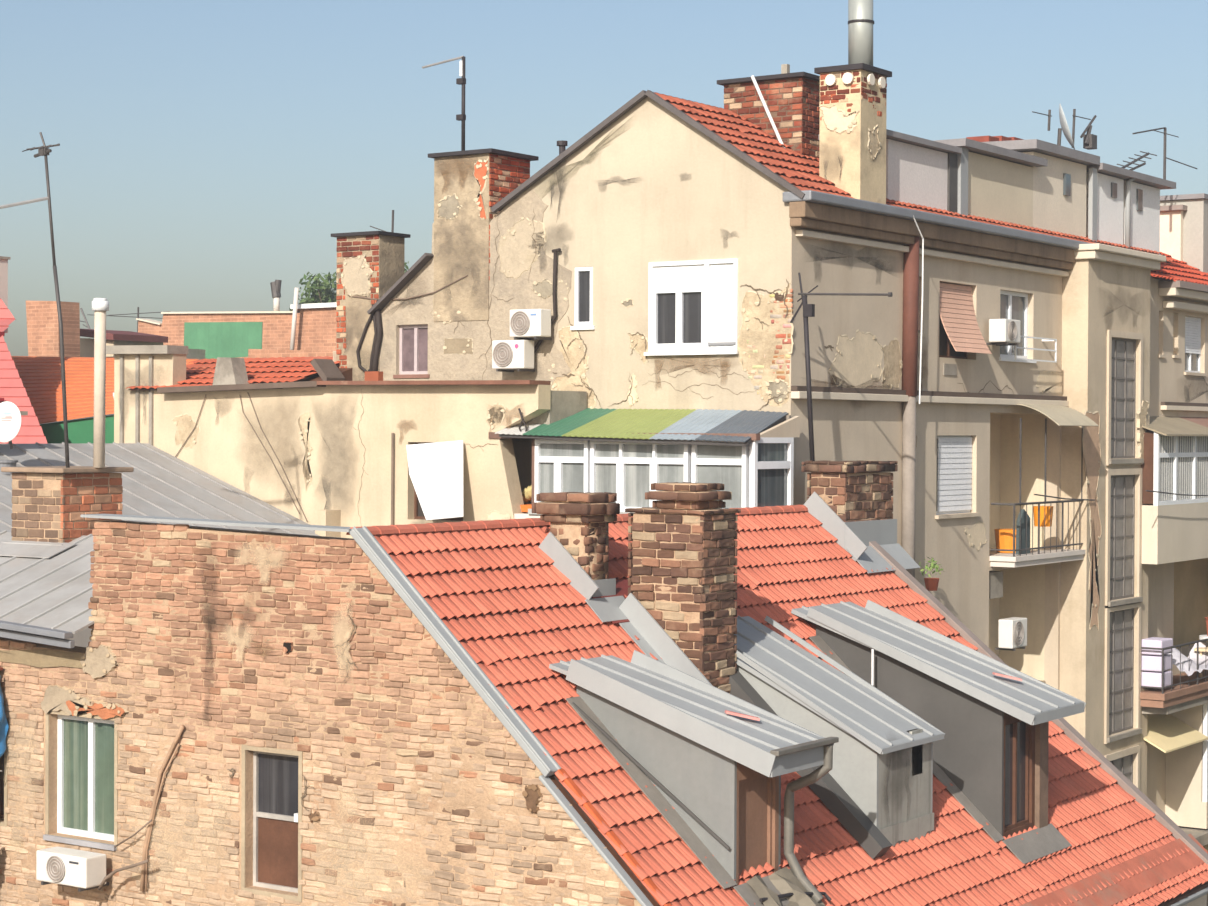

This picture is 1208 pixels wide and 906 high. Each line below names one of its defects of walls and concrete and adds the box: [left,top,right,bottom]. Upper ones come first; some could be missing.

spalling [819,104,881,160]
spalling [341,254,374,298]
spalling [548,325,597,409]
crack [553,317,786,410]
spalling [737,283,794,408]
spalling [827,329,903,390]
spalling [80,644,119,680]
spalling [41,685,129,720]